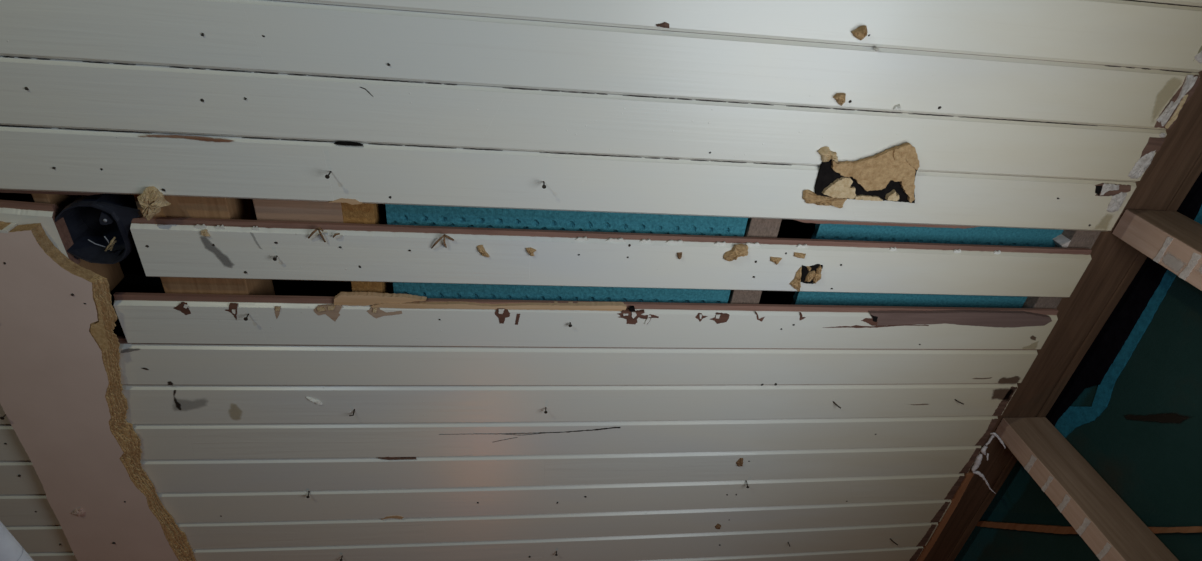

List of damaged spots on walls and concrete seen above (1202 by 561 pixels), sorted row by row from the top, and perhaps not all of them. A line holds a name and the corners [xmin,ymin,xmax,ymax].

crack [0,125,152,134]
peeling [1095,46,1202,212]
crack [242,136,334,144]
crack [374,143,503,151]
crack [540,152,787,165]
spalling [174,302,191,315]
spalling [225,303,238,319]
spalling [314,304,342,321]